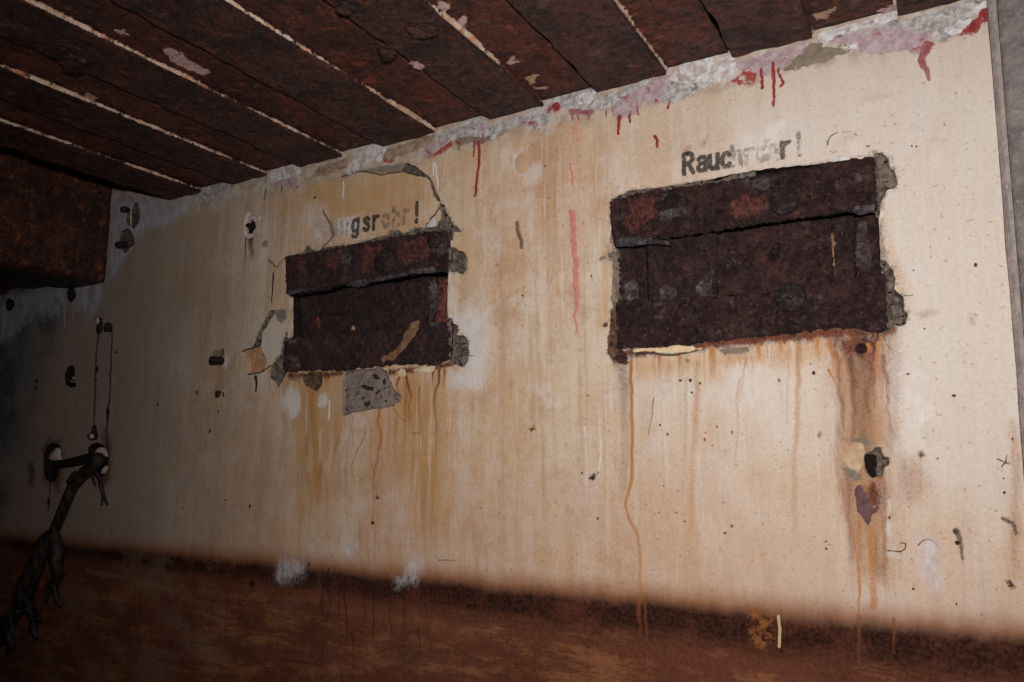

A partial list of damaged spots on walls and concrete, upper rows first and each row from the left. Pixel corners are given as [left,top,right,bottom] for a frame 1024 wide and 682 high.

peeling [813,0,987,53]
peeling [434,78,650,144]
peeling [661,53,740,104]
peeling [343,144,405,178]
crack [341,163,440,226]
spalling [829,150,902,226]
spalling [298,200,472,416]
rust [347,266,443,288]
rust [591,201,914,616]
rust [273,360,461,566]
spalling [862,443,893,483]
damp [0,416,1024,682]